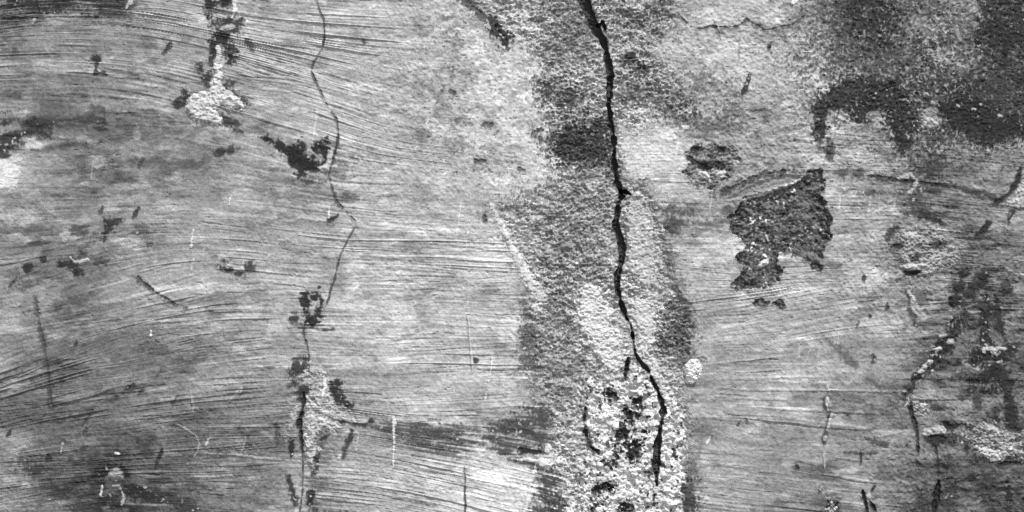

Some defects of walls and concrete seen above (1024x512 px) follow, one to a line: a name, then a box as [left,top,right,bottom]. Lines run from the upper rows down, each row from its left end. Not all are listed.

crack [311,6,356,304]
crack [578,0,667,486]
spalling [682,142,834,309]
damp [797,0,997,200]
damp [936,0,1024,155]
crack [296,327,310,511]